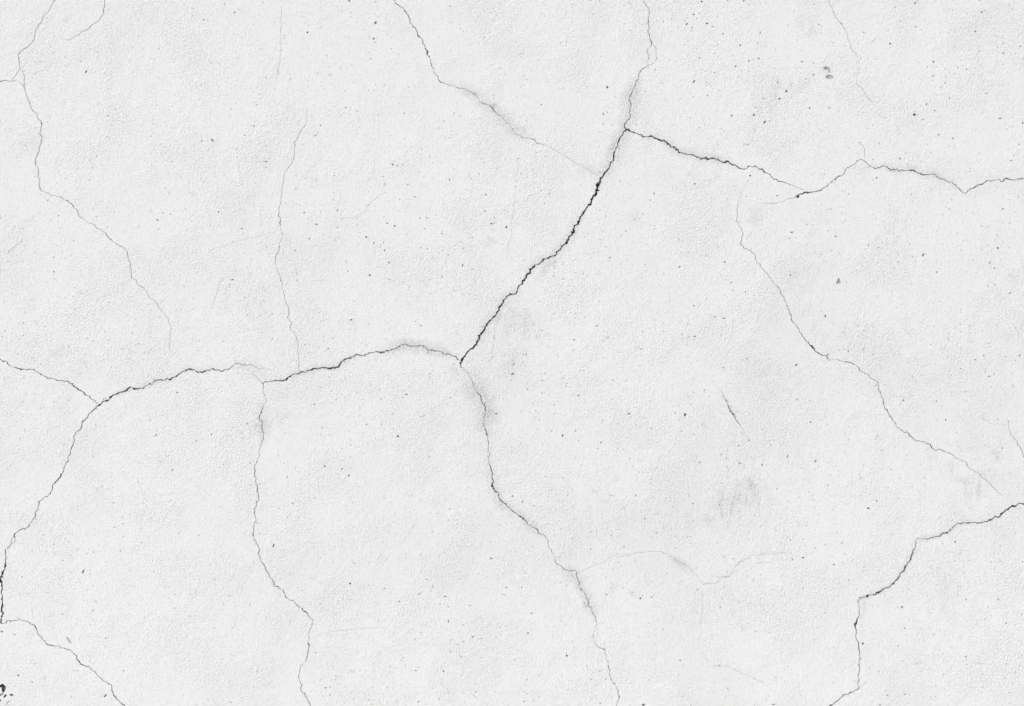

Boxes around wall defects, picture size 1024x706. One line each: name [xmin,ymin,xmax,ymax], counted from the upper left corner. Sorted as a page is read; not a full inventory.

crack [0,2,171,350]
crack [253,0,1024,706]
crack [0,359,261,706]